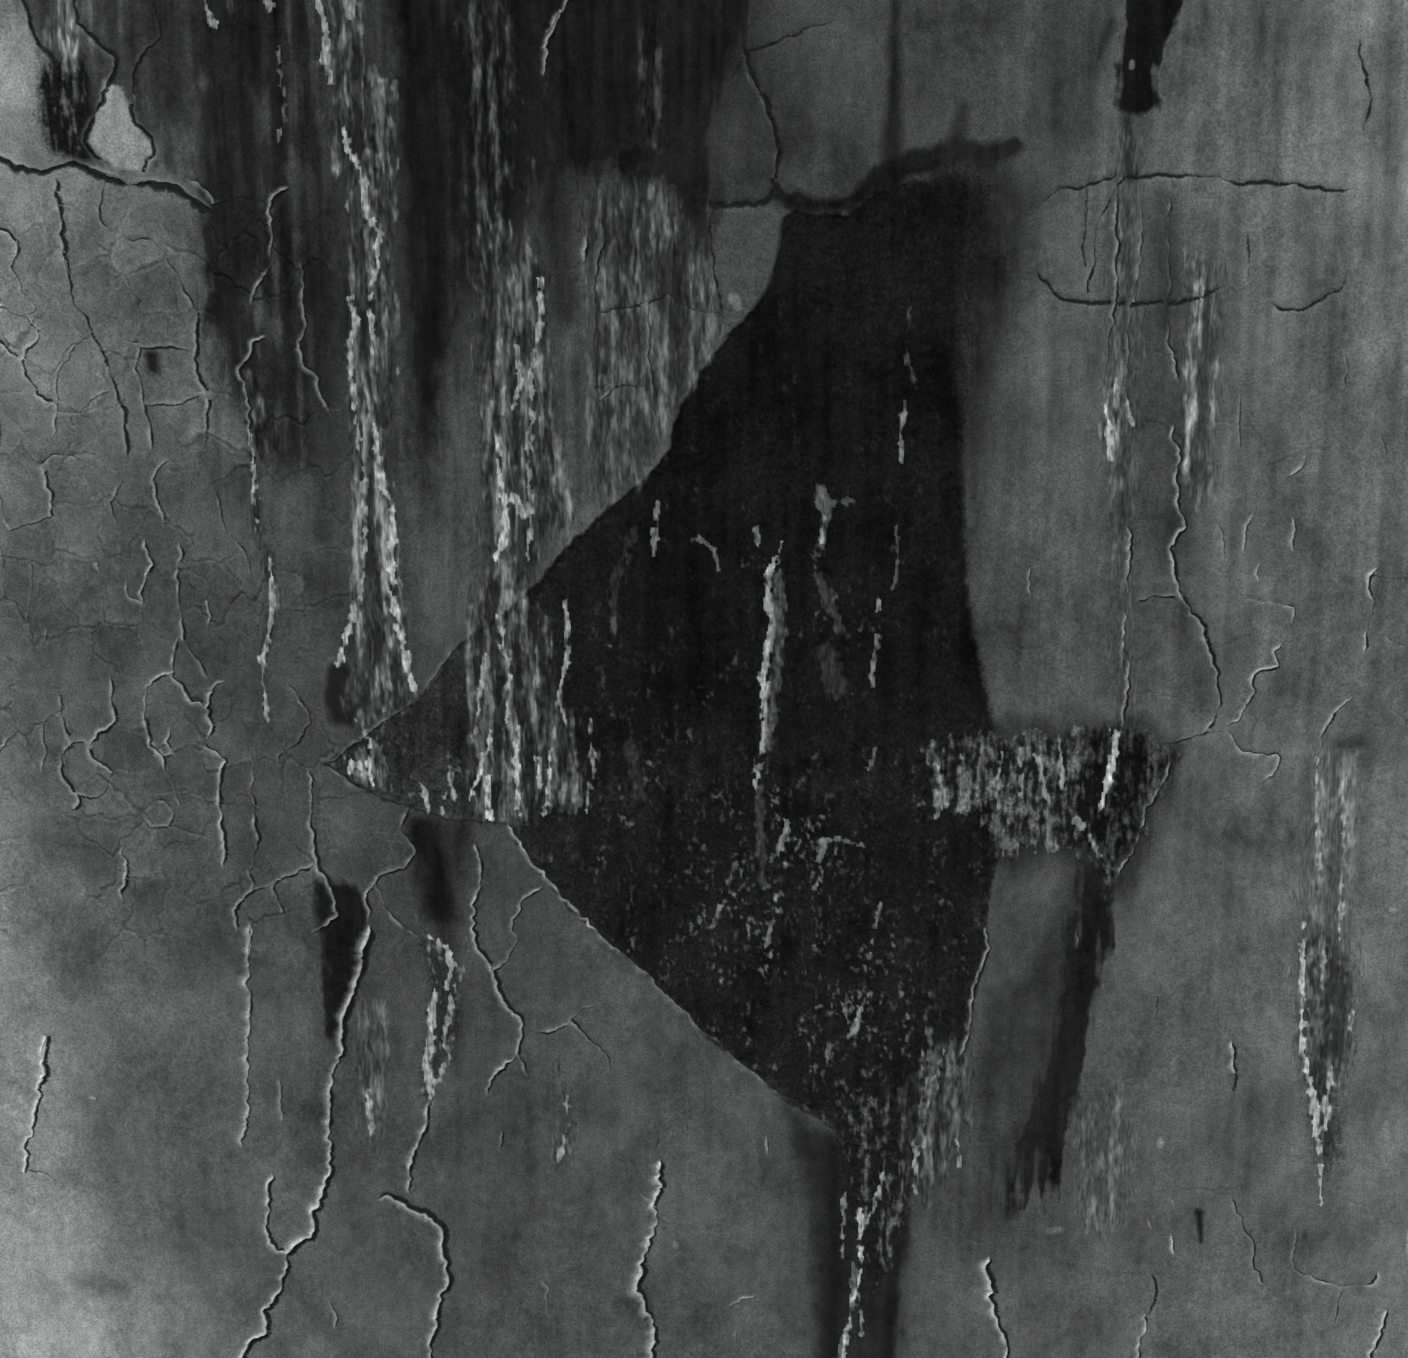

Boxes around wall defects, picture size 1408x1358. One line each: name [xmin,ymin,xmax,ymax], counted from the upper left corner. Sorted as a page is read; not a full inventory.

crack [0,0,460,1358]
leakage [2,0,750,1083]
spalling [321,639,469,821]
spalling [512,161,1182,1358]
leakage [767,0,1232,1358]
crack [1030,172,1357,880]
leakage [47,1097,264,1304]
leakage [311,874,392,1168]
spalling [416,934,471,1109]
crack [467,823,816,1157]
crack [618,1120,689,1358]
spalling [1290,950,1360,1176]